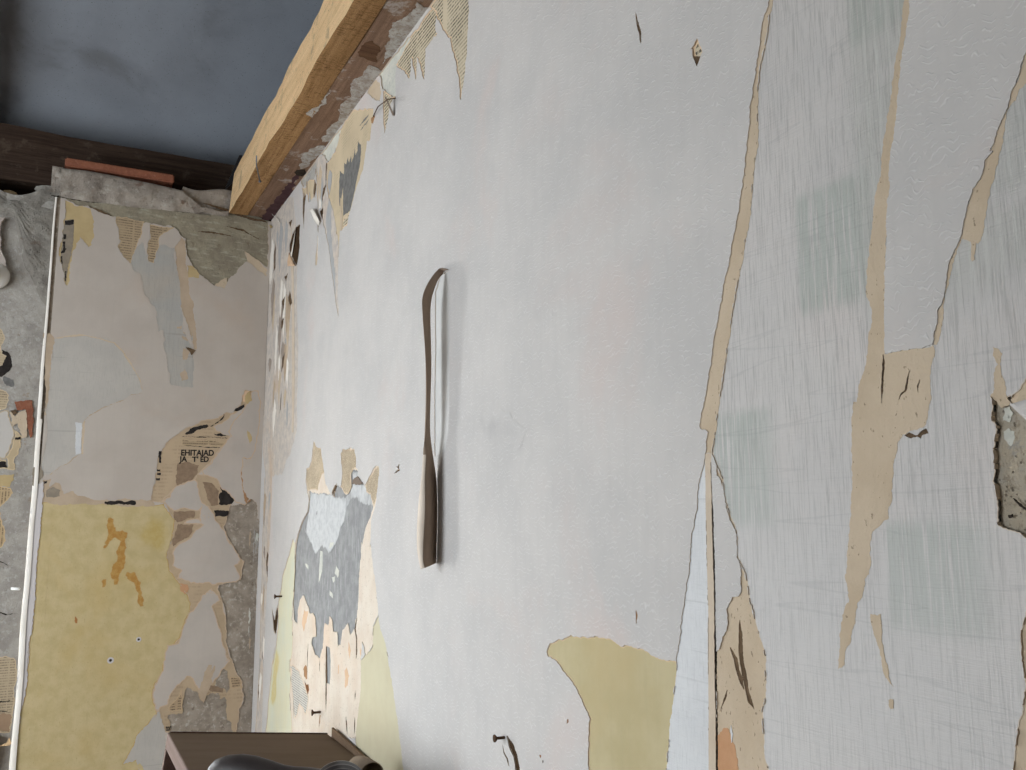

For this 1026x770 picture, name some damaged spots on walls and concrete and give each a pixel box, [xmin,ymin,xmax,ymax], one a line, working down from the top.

flaking render [368,38,410,129]
spalling [0,400,34,548]
peeling [17,479,155,734]
flaking render [50,166,269,289]
flaking render [166,499,260,733]
peeling [302,131,343,311]
spalling [294,470,373,684]
peeling [700,0,773,770]
peeling [838,0,1026,669]
spalling [1015,698,1026,770]